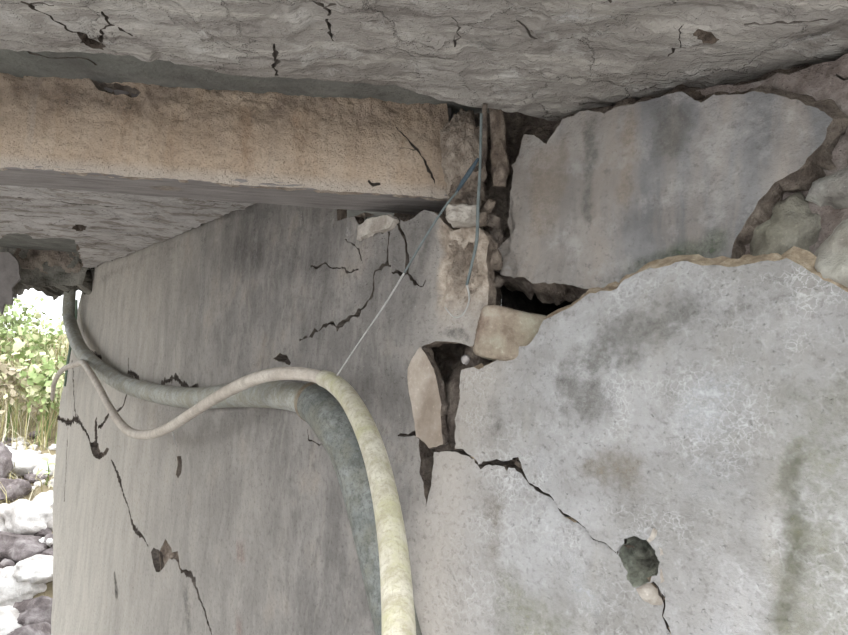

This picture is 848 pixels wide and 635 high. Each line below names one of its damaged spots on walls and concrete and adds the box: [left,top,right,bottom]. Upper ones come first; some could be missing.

crack [21,1,133,65]
crack [271,44,280,76]
crack [396,127,435,184]
spalling [0,248,82,315]
crack [299,217,426,341]
spalling [448,238,483,303]
crack [57,358,148,546]
peeling [407,347,448,504]
crack [430,441,620,554]
spalling [151,539,182,572]
crack [181,569,212,635]
crack [653,582,670,632]